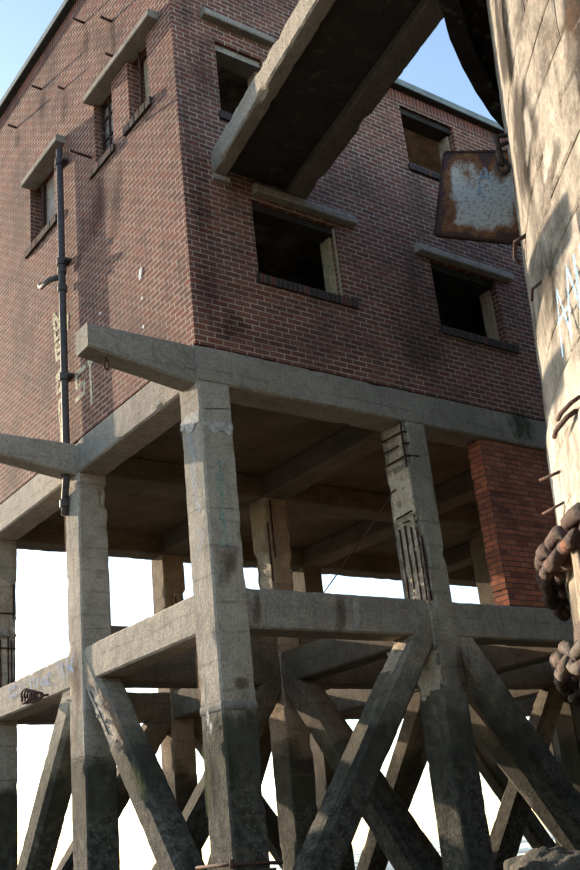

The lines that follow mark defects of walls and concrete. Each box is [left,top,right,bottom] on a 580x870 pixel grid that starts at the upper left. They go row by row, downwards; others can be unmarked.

rust [565,1,577,35]
damp [562,0,580,86]
damp [494,0,531,200]
damp [544,145,552,183]
peeling [180,411,233,436]
spalling [382,421,433,605]
spalling [0,577,16,688]
spalling [418,650,443,701]
spalling [88,689,123,747]